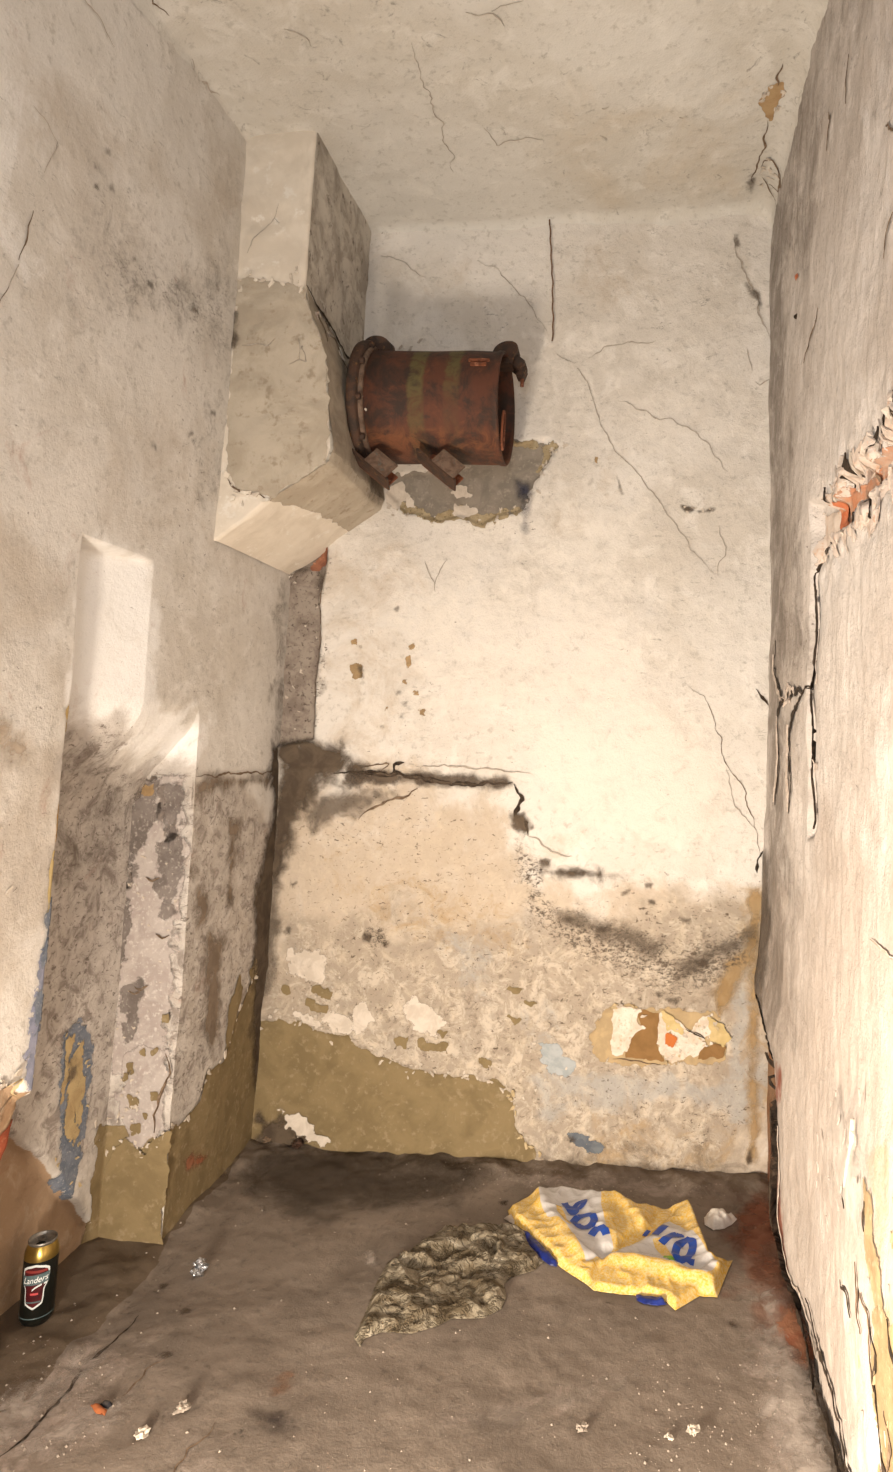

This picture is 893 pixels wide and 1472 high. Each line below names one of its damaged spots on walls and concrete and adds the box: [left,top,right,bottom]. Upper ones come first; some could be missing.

crack [0,211,34,301]
spalling [223,266,568,531]
crack [477,260,726,574]
spalling [810,390,893,829]
leakage [307,770,511,832]
crack [336,761,570,857]
crack [694,640,810,872]
peeling [0,806,59,1160]
leakage [363,928,387,947]
peeling [47,774,731,1245]
leakage [250,1109,478,1211]